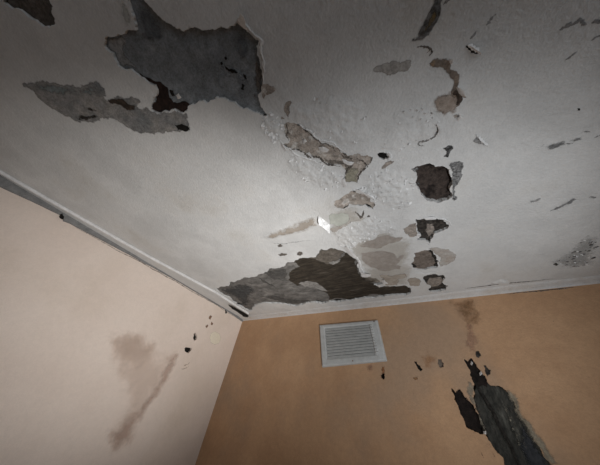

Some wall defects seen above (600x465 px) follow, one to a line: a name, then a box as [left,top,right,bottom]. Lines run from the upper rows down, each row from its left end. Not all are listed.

spalling [6,0,55,26]
spalling [22,0,276,134]
peeling [374,60,411,75]
peeling [430,58,467,121]
peeling [281,101,376,234]
spalling [412,145,464,201]
spalling [217,217,456,310]